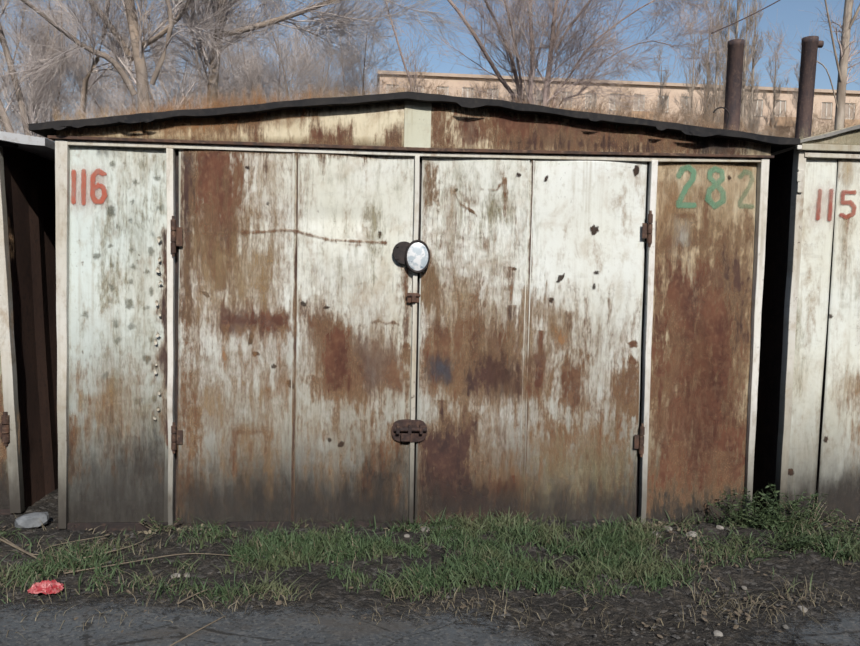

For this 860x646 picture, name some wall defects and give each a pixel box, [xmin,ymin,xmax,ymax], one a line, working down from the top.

corrosion [53,88,755,523]